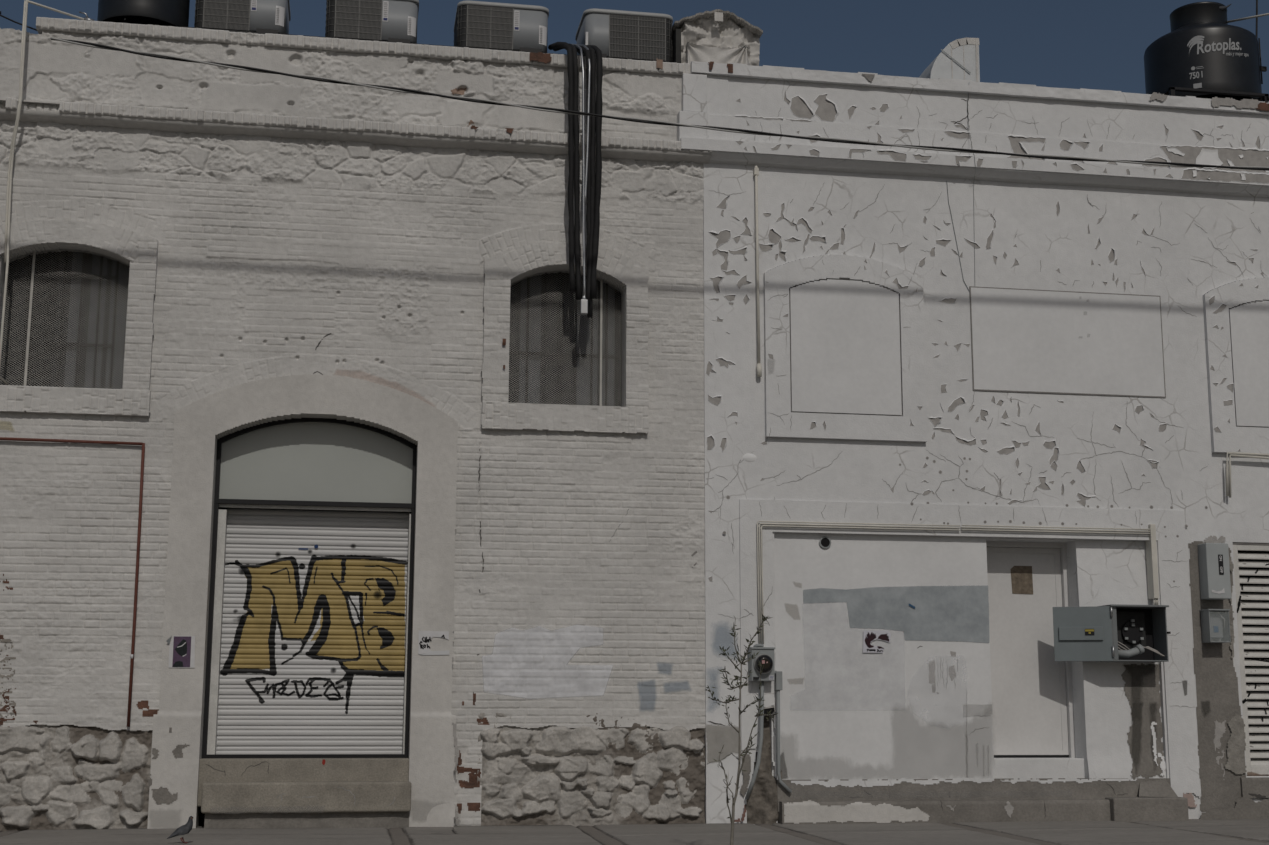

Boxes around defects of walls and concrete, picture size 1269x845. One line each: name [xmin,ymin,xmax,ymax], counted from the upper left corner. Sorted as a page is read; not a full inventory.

peeling [734,90,932,163]
peeling [941,123,971,140]
peeling [709,194,859,305]
peeling [918,213,1019,276]
peeling [706,357,736,376]
crack [709,375,839,551]
peeling [910,378,1096,507]
crack [877,395,1206,524]
peeling [0,635,16,727]
peeling [452,723,481,788]
peeling [1121,663,1166,778]
peeling [455,803,480,824]